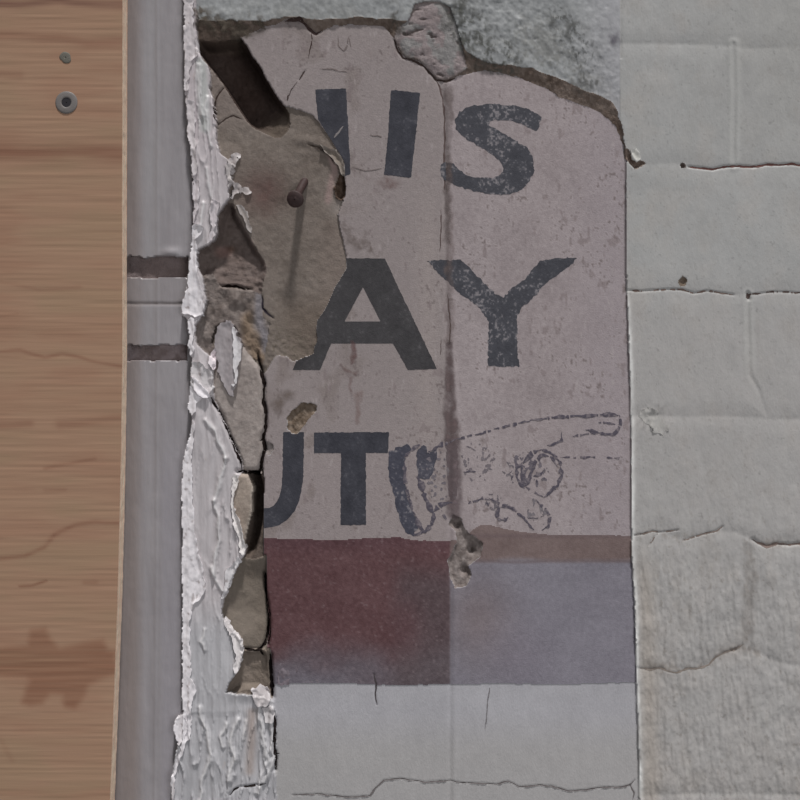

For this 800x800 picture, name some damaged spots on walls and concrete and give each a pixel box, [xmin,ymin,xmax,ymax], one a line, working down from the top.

spalling [448,42,645,169]
crack [690,162,800,170]
crack [633,289,800,299]
spalling [170,0,434,800]
damp [444,342,461,518]
crack [636,526,723,543]
crack [753,539,800,548]
crack [641,644,743,674]
crack [298,778,635,798]